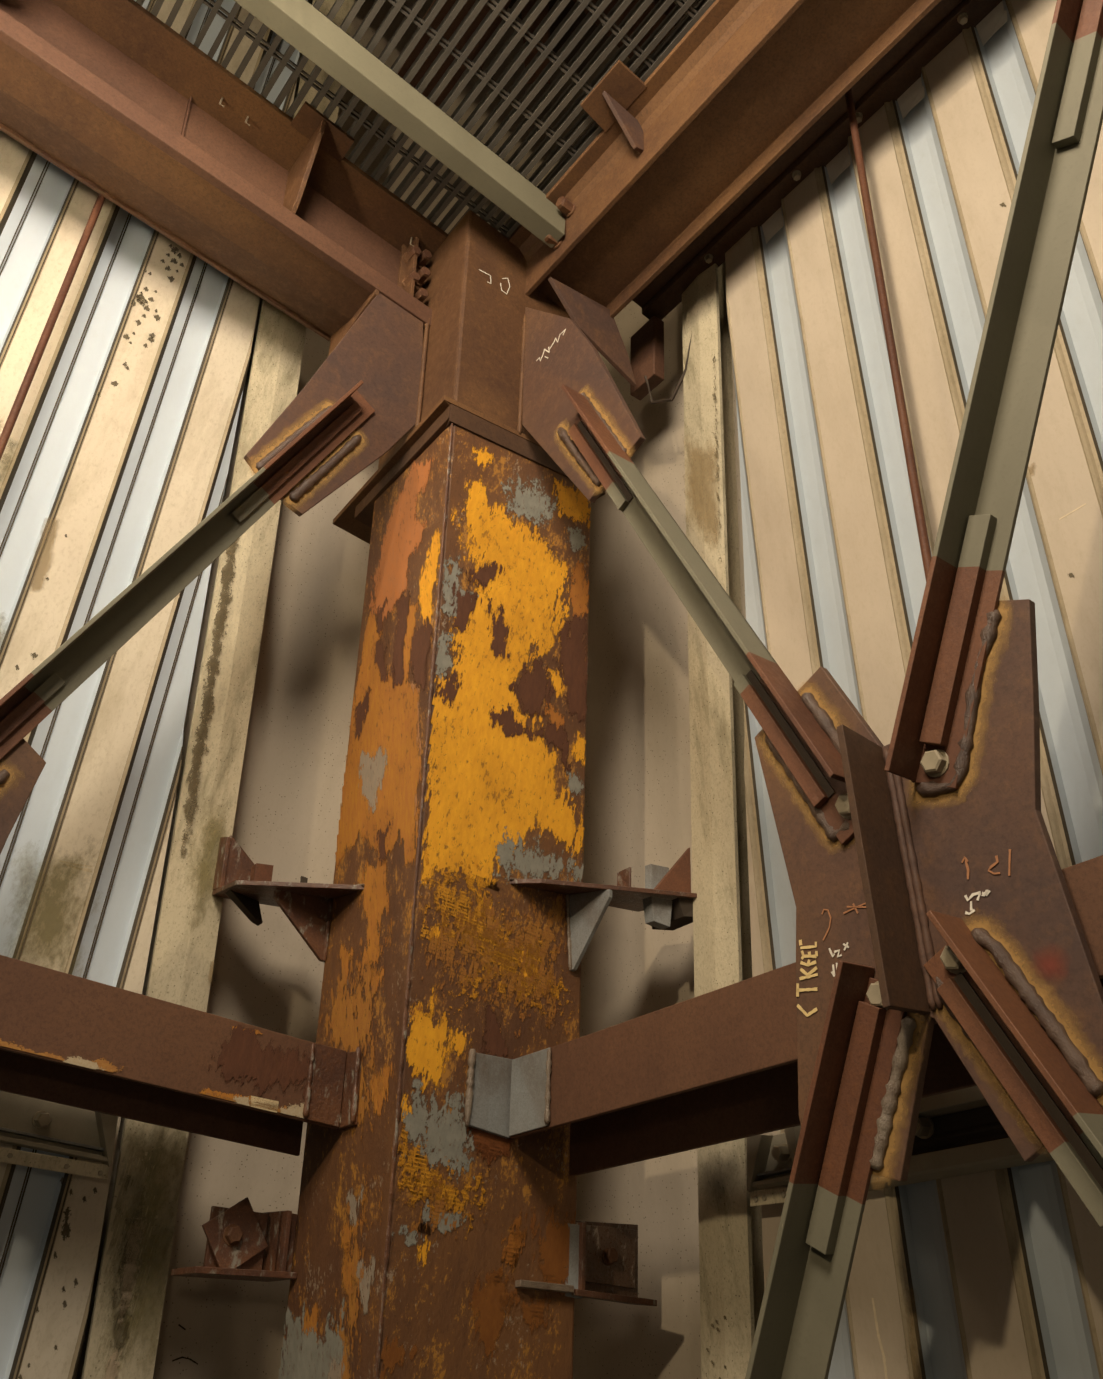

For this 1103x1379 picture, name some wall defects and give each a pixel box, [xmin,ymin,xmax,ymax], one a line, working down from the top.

water stain [123,244,184,348]
water stain [180,538,240,894]
corrosion [353,590,463,740]
corrosion [451,560,588,773]
corrosion [376,820,391,865]
peeling [278,446,591,1379]
corrosion [199,1024,310,1119]